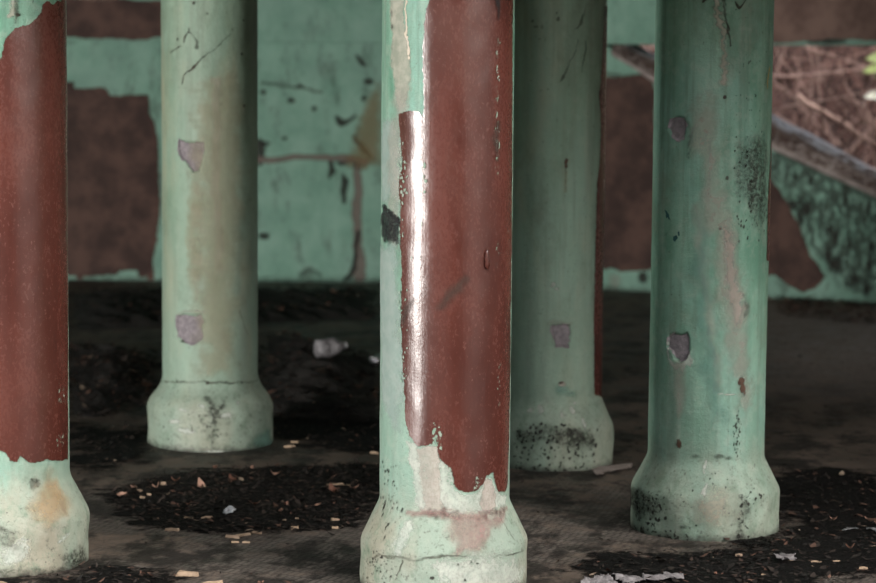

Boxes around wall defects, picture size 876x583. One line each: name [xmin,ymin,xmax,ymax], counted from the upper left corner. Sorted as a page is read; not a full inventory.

crack [175,29,226,84]
crack [702,0,746,99]
spalling [177,139,204,172]
water stain [725,123,876,322]
spalling [175,315,204,346]
spalling [666,332,693,372]
peeling [406,423,506,516]
water stain [513,402,598,472]